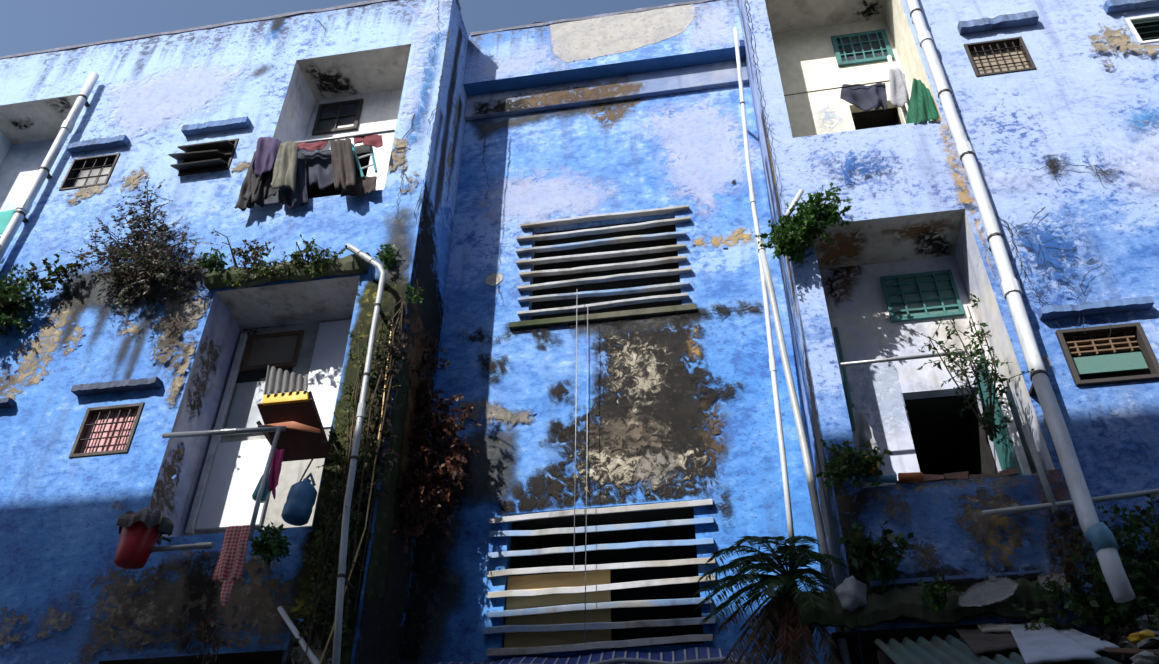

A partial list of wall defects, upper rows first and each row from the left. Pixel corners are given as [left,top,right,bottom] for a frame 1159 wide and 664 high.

damp [268,17,284,42]
flaking render [1088,14,1159,68]
peeling [67,166,148,205]
peeling [0,298,85,400]
damp [59,258,208,380]
peeling [115,290,221,422]
spalling [0,547,332,664]
peeling [148,443,185,520]
damp [282,208,428,664]
damp [402,301,762,664]
peeling [871,475,1036,607]
spalling [1037,573,1071,591]